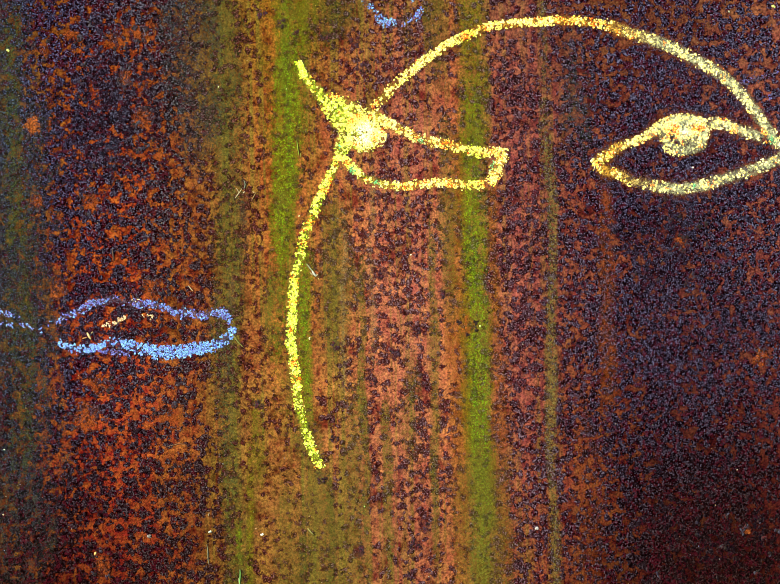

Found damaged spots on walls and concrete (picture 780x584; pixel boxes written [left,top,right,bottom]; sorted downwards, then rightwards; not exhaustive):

rust [25,112,45,140]
rust [68,407,101,435]